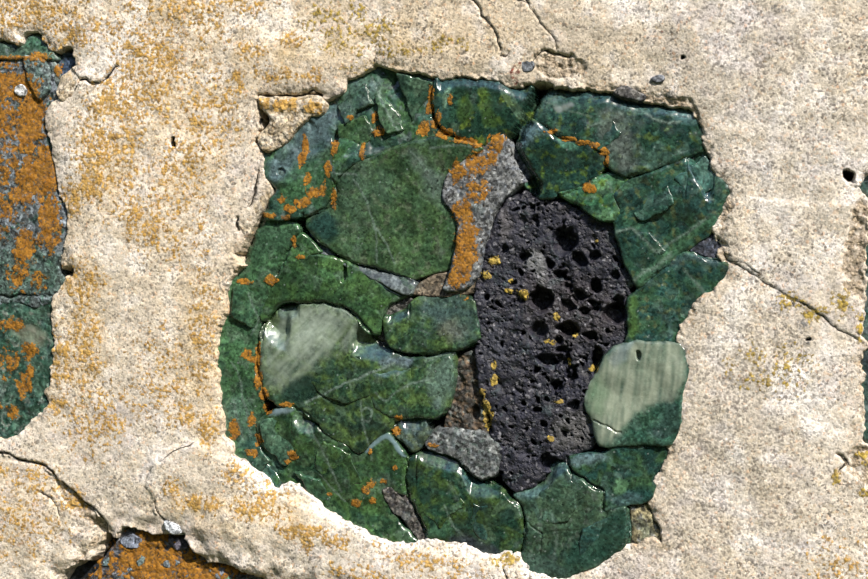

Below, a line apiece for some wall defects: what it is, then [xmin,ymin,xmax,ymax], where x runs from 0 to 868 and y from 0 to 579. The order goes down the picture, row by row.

crack [472,0,509,57]
crack [520,0,572,61]
peeling [58,52,75,76]
spalling [612,75,699,120]
spalling [717,197,733,262]
spalling [842,201,868,298]
crack [0,451,108,530]
peeling [425,422,502,481]
spalling [845,446,868,483]
peeling [629,503,661,544]